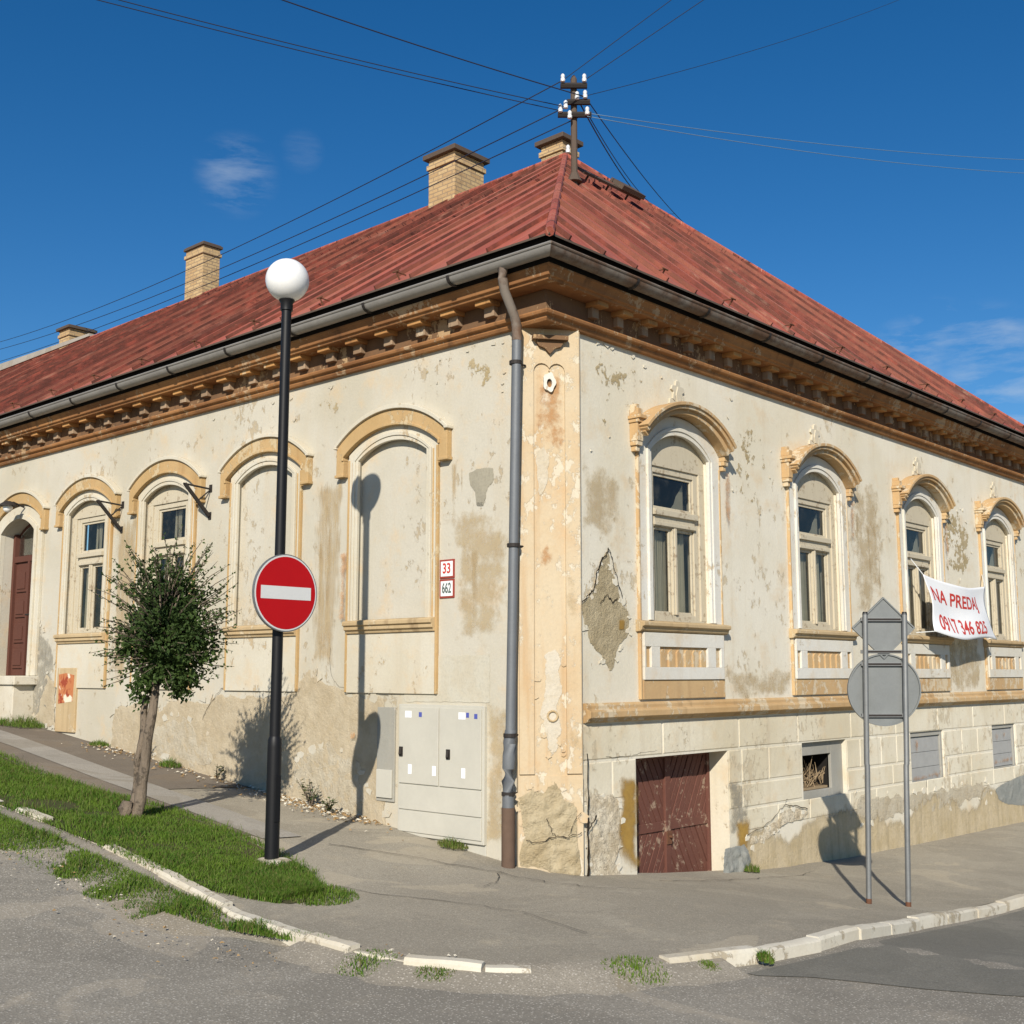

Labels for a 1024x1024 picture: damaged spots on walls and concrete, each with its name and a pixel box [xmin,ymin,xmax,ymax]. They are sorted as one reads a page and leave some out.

flaking render [581,553,632,671]
peeling [534,649,566,759]
flaking render [514,780,626,876]
flaking render [745,806,808,851]